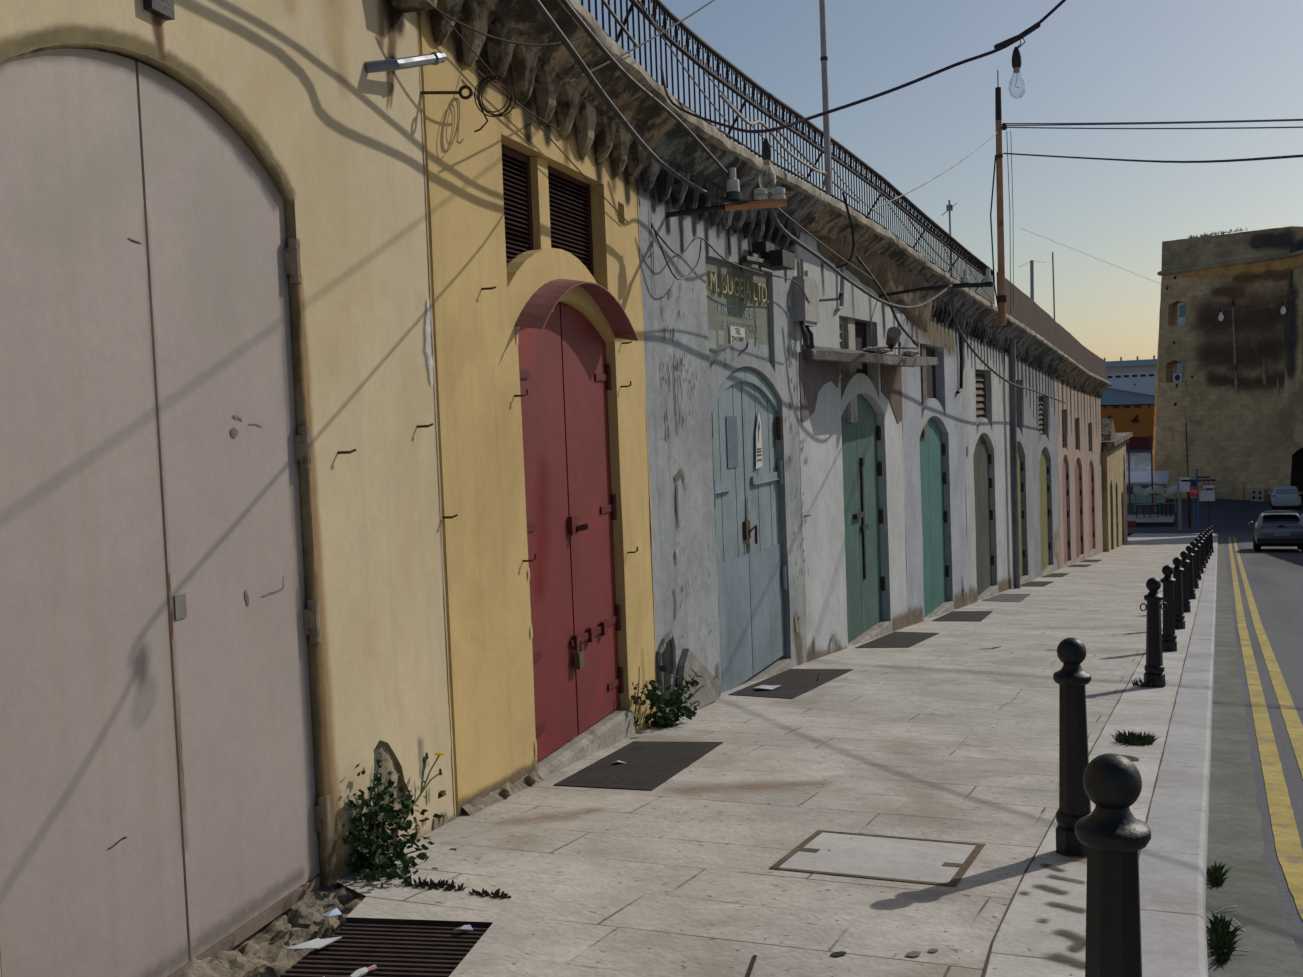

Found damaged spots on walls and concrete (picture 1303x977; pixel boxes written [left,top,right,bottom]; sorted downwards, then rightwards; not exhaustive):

rust [153,13,164,60]
leakage [1182,254,1303,395]
peeling [674,469,686,565]